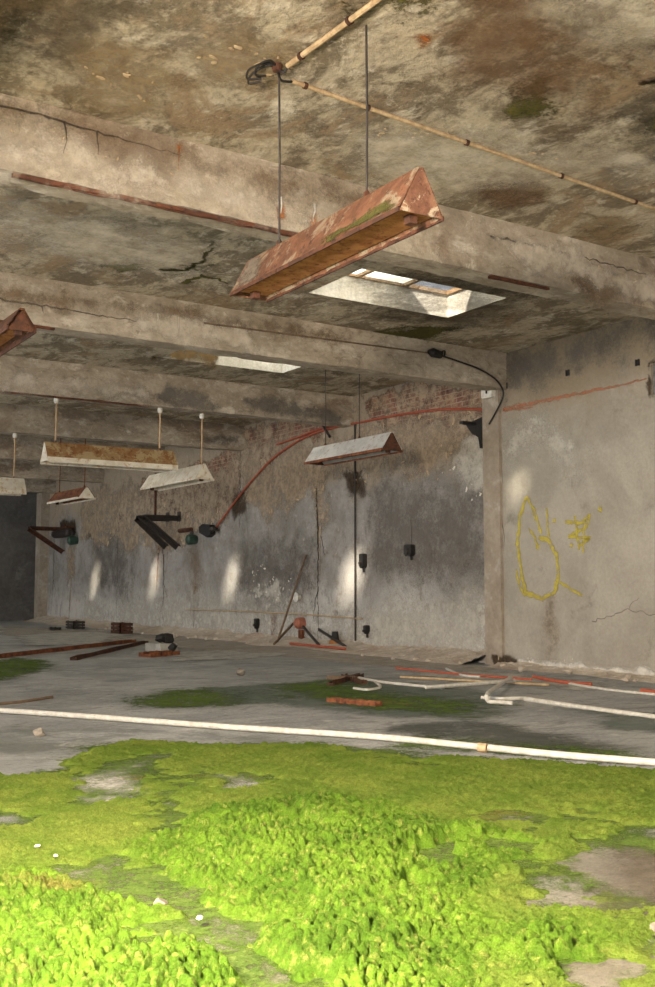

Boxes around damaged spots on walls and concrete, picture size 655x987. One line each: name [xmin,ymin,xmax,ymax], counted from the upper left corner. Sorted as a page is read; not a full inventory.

damp [447,0,590,96]
peeling [60,381,483,554]
damp [95,540,133,596]
damp [238,481,330,608]
damp [368,473,484,590]